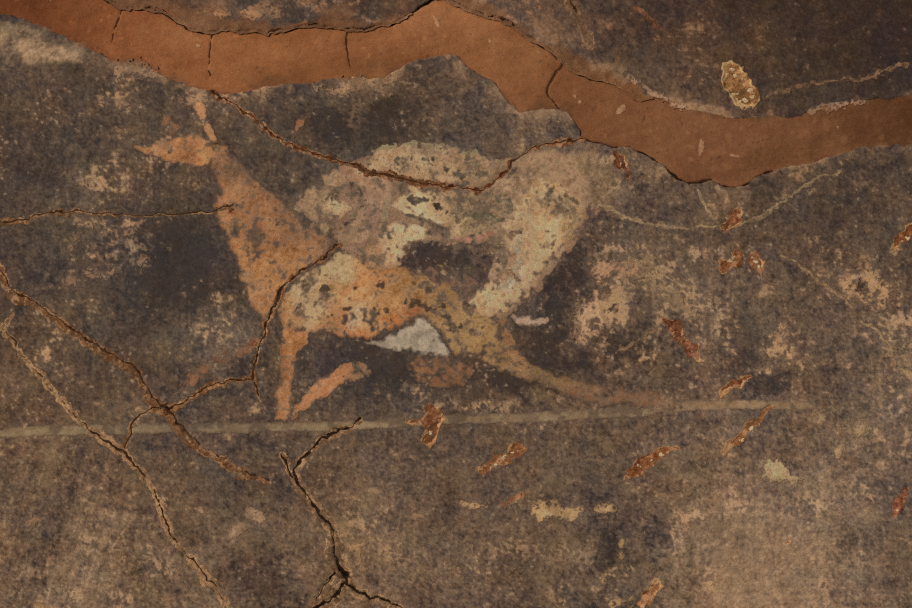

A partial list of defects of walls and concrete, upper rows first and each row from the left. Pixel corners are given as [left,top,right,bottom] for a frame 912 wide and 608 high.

peeling [195,2,265,21]
peeling [111,56,160,84]
peeling [310,74,366,98]
peeling [619,69,687,111]
spalling [721,60,760,110]
peeling [807,97,866,116]
spalling [612,150,631,179]
crack [0,203,234,226]
crack [0,242,404,608]